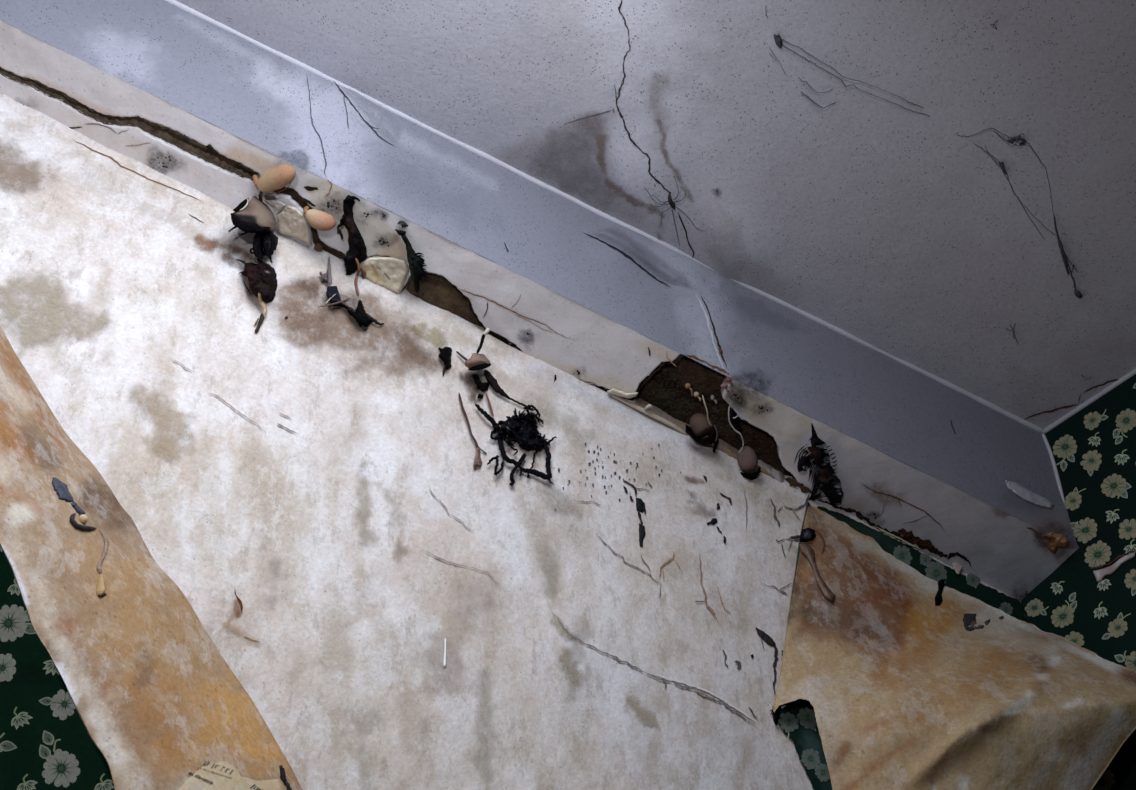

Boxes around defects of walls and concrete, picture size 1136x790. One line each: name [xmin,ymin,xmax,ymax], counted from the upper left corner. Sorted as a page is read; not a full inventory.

water stain [0,146,40,191]
mould [149,152,177,172]
crack [0,67,396,259]
water stain [542,135,657,211]
crack [566,0,694,258]
peeling [264,200,312,246]
water stain [281,277,445,371]
spalling [360,254,522,351]
peeling [0,326,302,790]
crack [599,536,731,623]
peeling [607,355,1136,790]
crack [548,604,758,726]